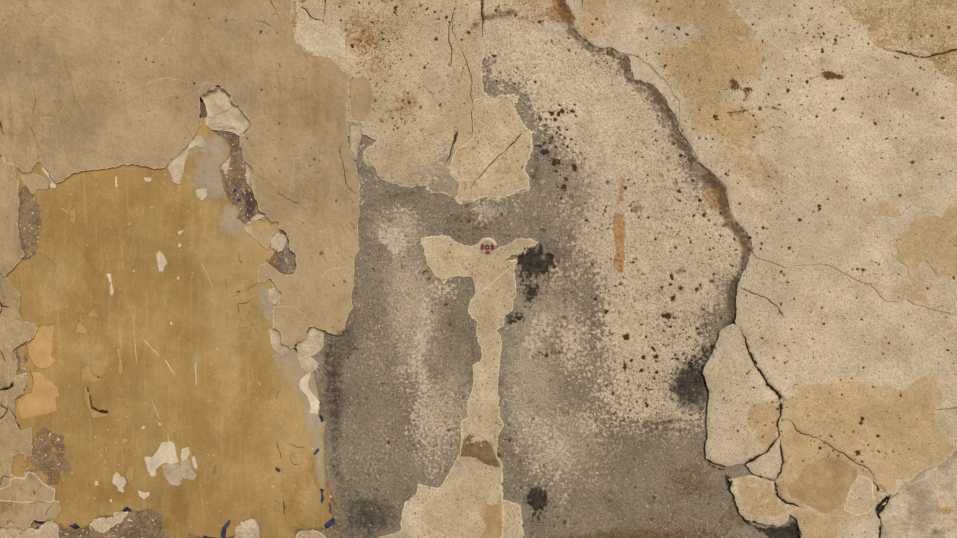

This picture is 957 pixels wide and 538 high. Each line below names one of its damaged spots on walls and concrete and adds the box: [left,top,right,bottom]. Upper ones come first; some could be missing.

crack [446,0,484,162]
corrosion [526,0,575,24]
spalling [837,0,957,86]
crack [888,48,957,58]
peeling [0,83,333,538]
spalling [273,0,799,538]
corrosion [613,178,625,272]
crack [741,288,783,316]
crack [0,351,20,428]
crack [740,329,891,538]
spalling [877,450,957,538]